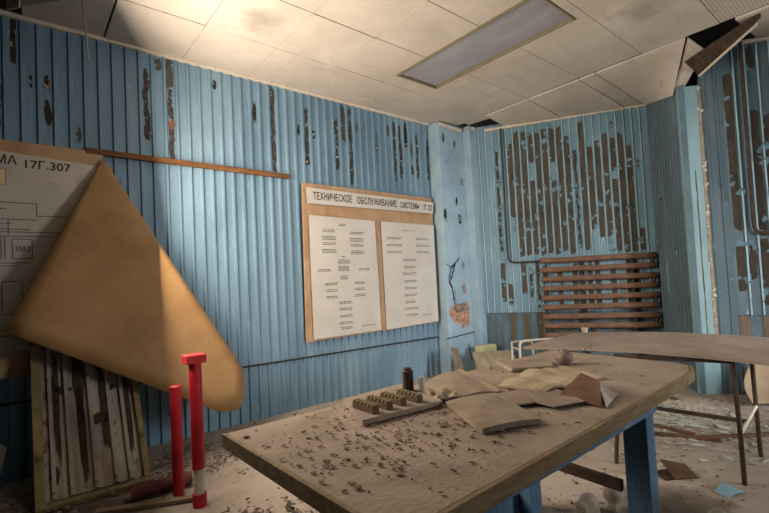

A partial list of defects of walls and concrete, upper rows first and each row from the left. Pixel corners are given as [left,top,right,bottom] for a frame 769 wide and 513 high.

peeling [7,18,18,64]
peeling [744,44,754,72]
peeling [43,75,53,125]
peeling [142,56,176,159]
peeling [269,86,277,173]
peeling [296,108,315,166]
peeling [334,104,354,185]
peeling [387,121,430,183]
peeling [722,73,769,305]
peeling [494,117,646,351]
crack [446,258,460,305]
flaking render [449,284,470,329]